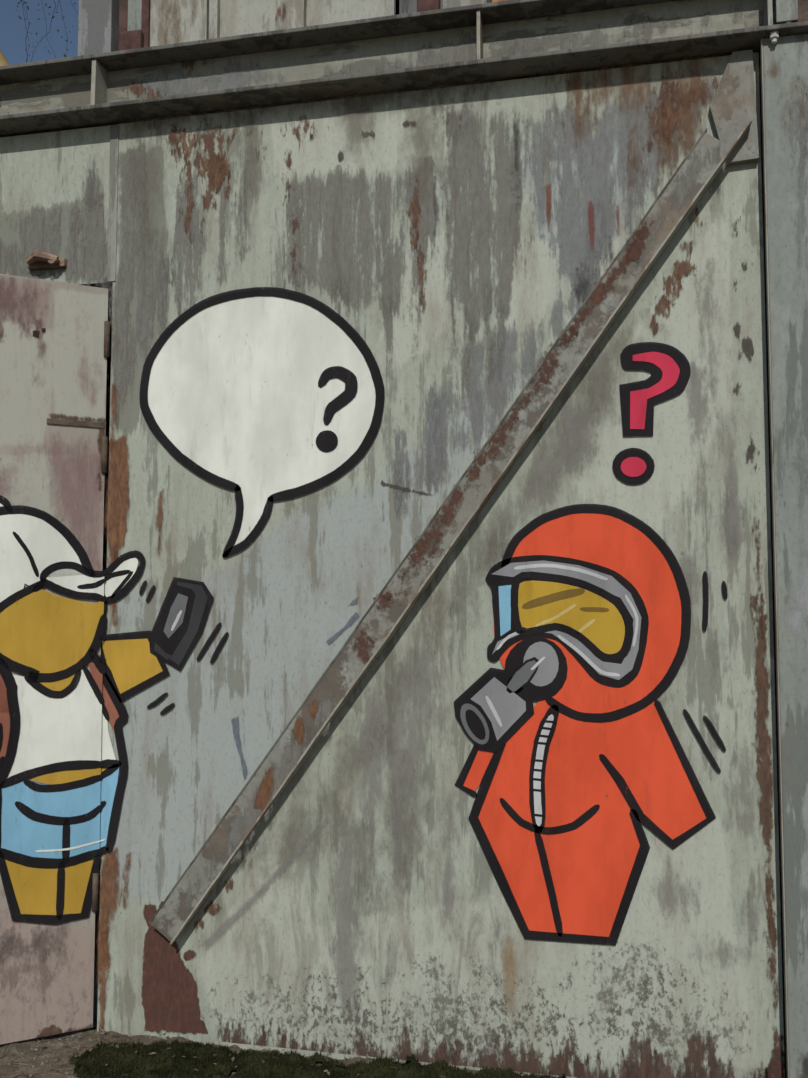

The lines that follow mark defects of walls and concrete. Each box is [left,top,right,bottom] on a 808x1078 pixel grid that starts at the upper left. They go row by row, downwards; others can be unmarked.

corrosion [166,117,235,237]
corrosion [642,74,718,152]
corrosion [649,241,695,335]
corrosion [398,222,652,584]
corrosion [50,384,130,565]
corrosion [352,630,374,664]
corrosion [373,593,391,610]
corrosion [750,522,779,1009]
corrosion [36,848,131,1038]
peeling [233,944,748,1078]